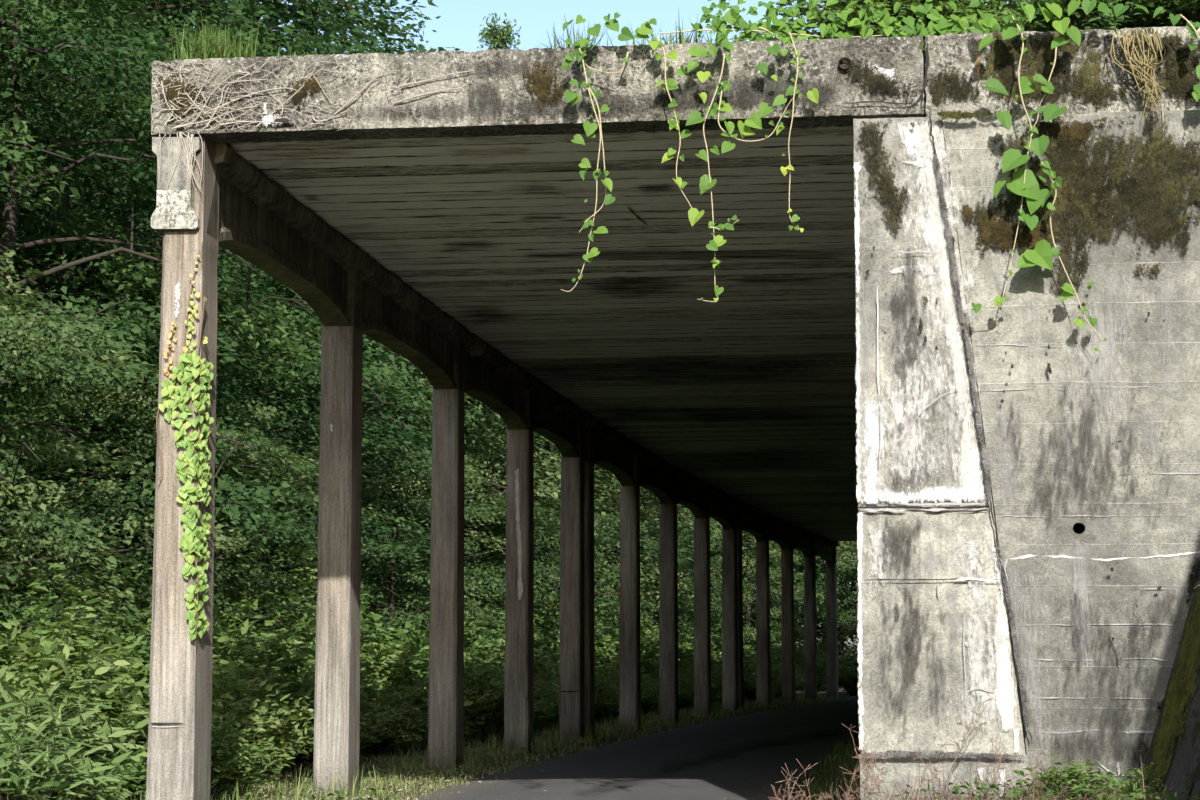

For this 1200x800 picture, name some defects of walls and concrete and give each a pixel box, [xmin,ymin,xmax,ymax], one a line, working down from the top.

crack [841,42,936,154]
damp [859,121,986,506]
damp [1030,390,1137,522]
damp [869,518,944,721]
damp [948,530,1019,753]
damp [1055,595,1174,775]